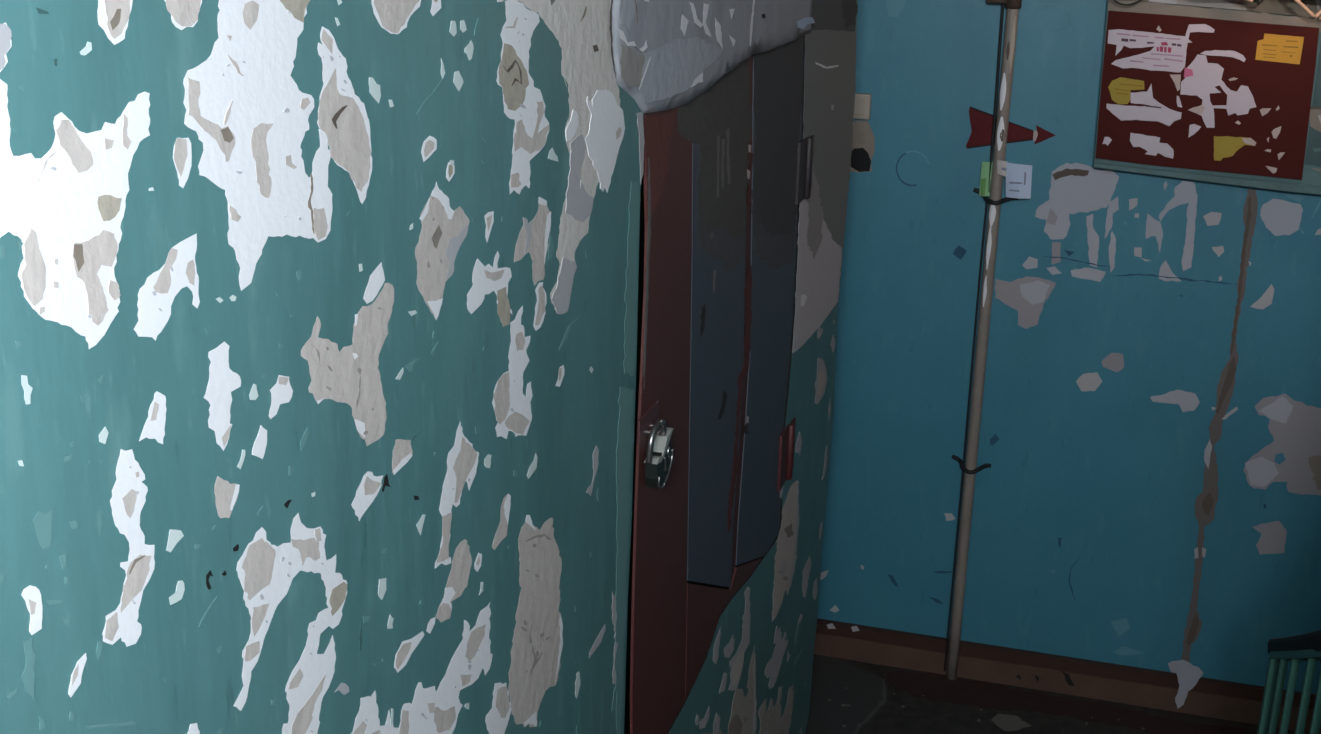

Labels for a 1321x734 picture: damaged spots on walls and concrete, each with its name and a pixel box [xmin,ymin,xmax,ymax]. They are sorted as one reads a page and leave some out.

peeling [21,585,43,635]
peeling [0,22,150,349]
peeling [97,0,133,45]
peeling [102,391,185,647]
peeling [134,233,200,341]
peeling [173,0,394,303]
flaking render [204,262,413,521]
peeling [234,421,563,734]
flaking render [372,0,441,34]
flaking render [408,0,645,734]
peeling [983,163,1222,329]
crack [1043,189,1258,662]